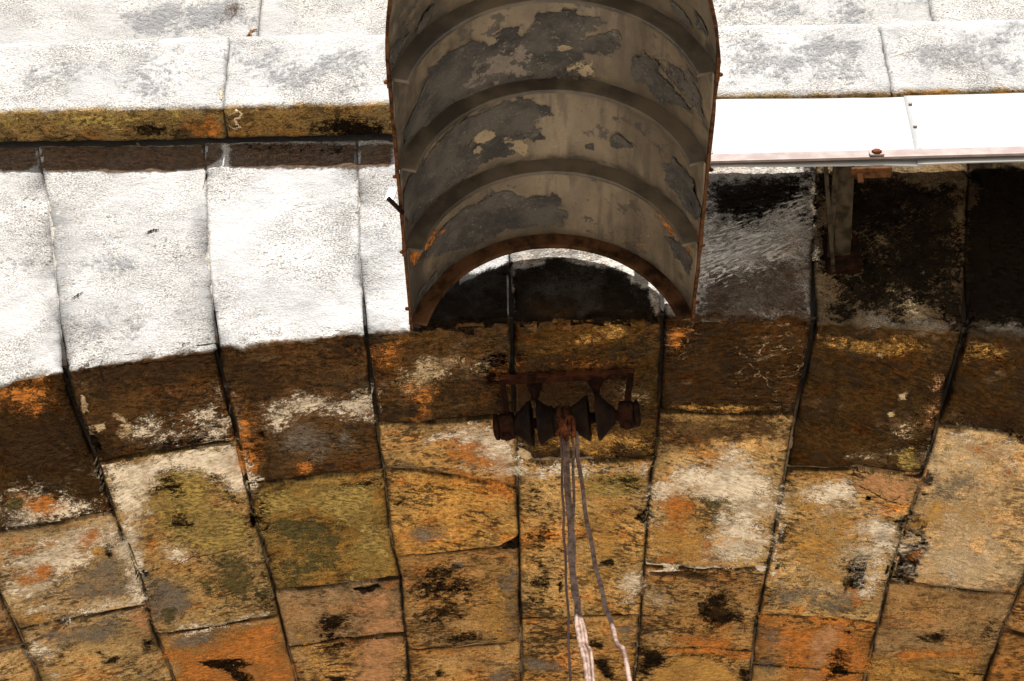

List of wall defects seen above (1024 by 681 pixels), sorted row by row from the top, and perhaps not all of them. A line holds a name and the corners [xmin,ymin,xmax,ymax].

peeling [403,10,622,148]
peeling [404,96,554,226]
peeling [414,191,569,310]
peeling [669,237,692,275]
water stain [695,162,1024,356]
rust [0,375,55,419]
water stain [0,338,374,661]
water stain [293,258,1024,681]